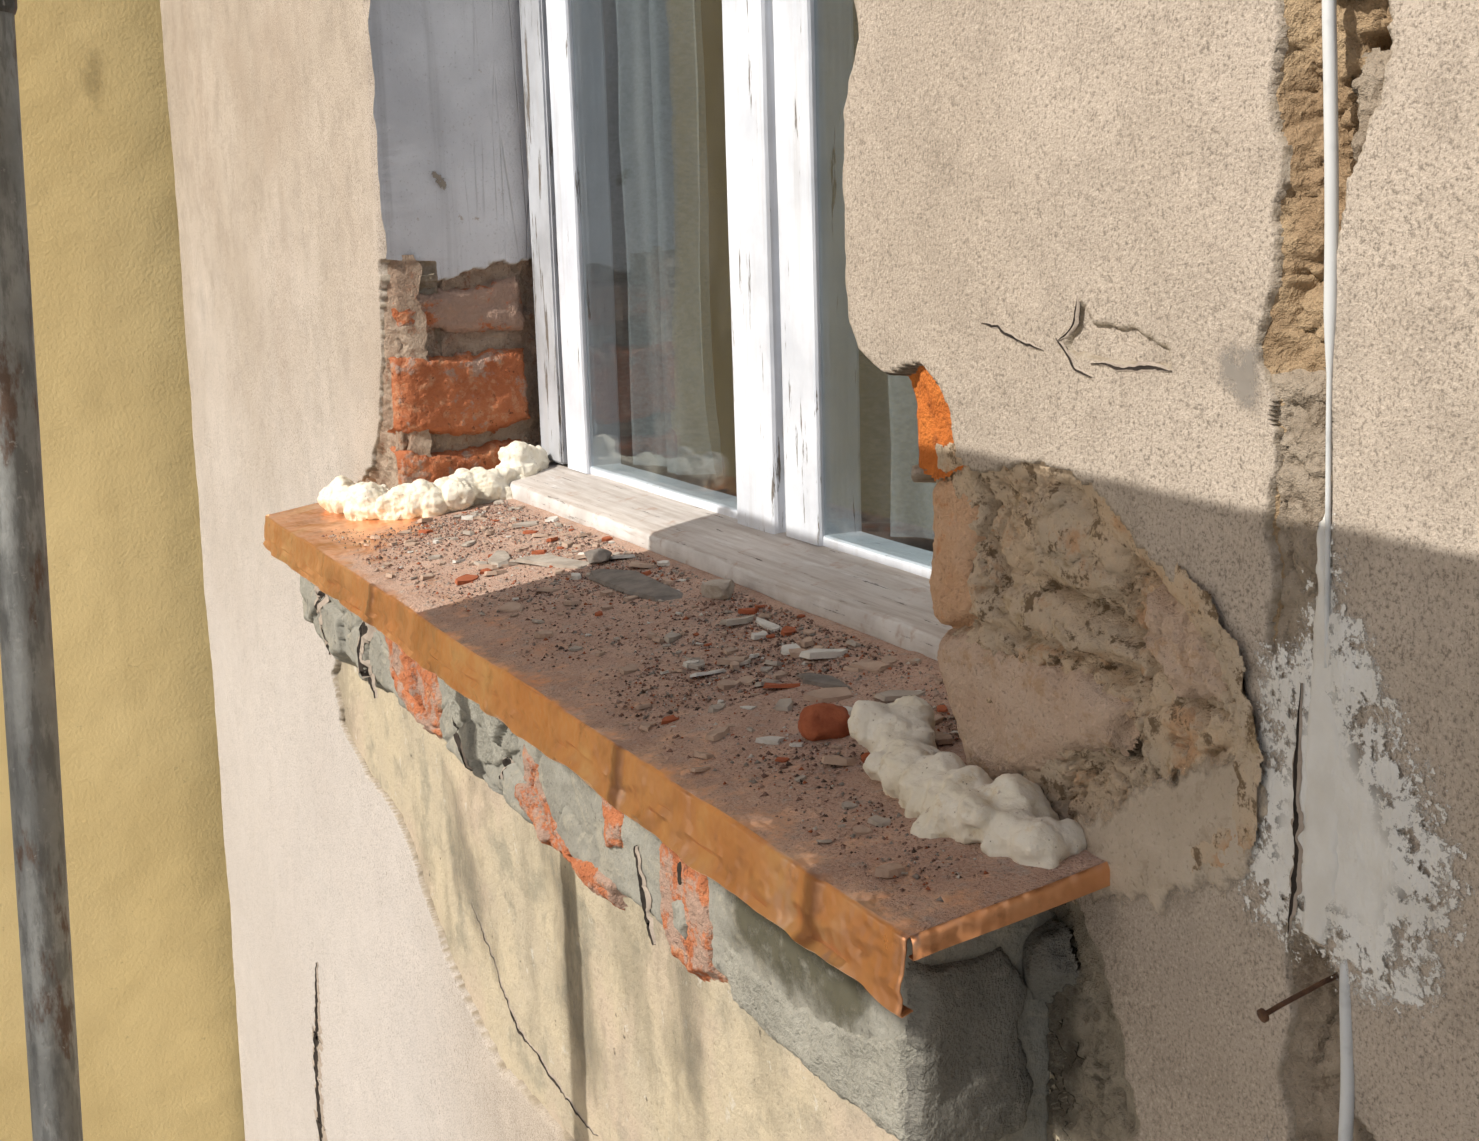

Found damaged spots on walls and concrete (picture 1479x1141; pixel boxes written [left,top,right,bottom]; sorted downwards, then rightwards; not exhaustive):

flaking render [364,255,541,489]
crack [983,295,1171,377]
flaking render [907,366,1269,1141]
crack [1287,683,1304,934]
crack [312,962,328,1141]
crack [471,902,599,1136]